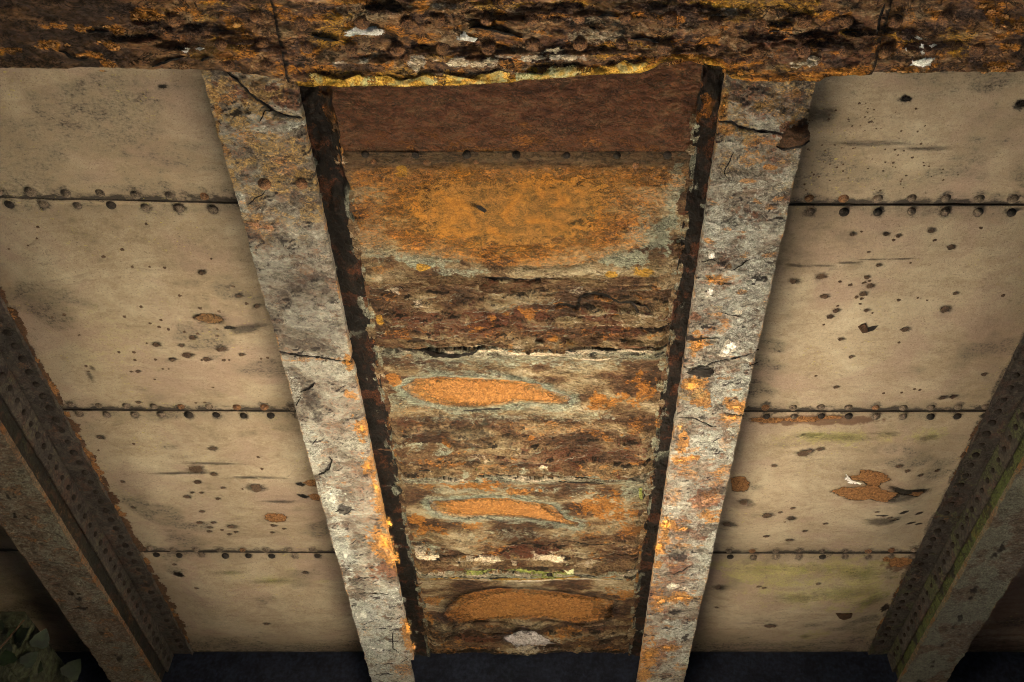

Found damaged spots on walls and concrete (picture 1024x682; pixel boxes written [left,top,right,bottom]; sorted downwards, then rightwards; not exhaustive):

corrosion [37,12,287,72]
corrosion [363,1,602,27]
corrosion [309,21,964,87]
corrosion [614,2,750,17]
crack [152,56,298,121]
spalling [776,110,856,179]
peeling [146,307,261,380]
corrosion [347,166,694,651]
corrosion [686,368,714,391]
spalling [797,447,825,456]
peeling [731,476,753,505]
peeling [831,464,940,525]